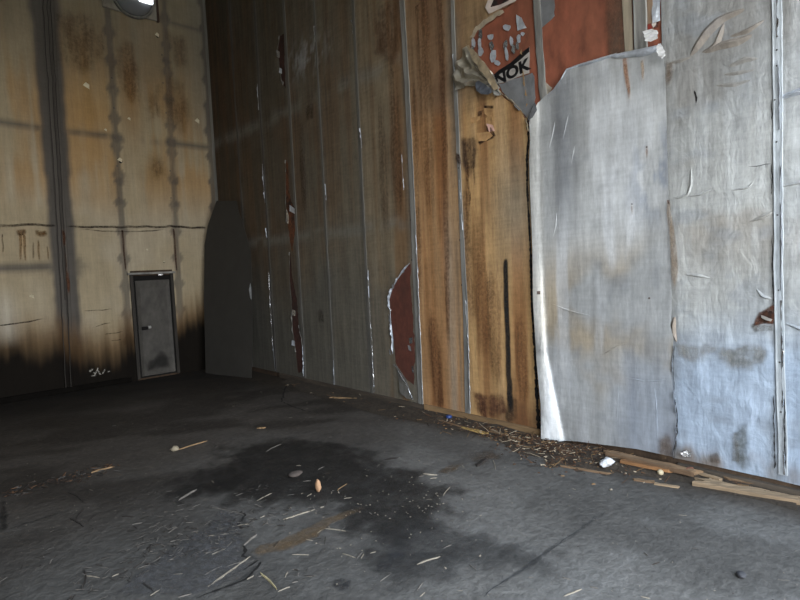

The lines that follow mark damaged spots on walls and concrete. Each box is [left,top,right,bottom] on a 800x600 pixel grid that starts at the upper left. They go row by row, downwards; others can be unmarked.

peeling [608,0,625,55]
peeling [647,0,660,30]
peeling [452,0,536,131]
rust [12,223,54,258]
rust [62,225,205,270]
peeling [387,264,415,399]
leakage [179,440,484,571]